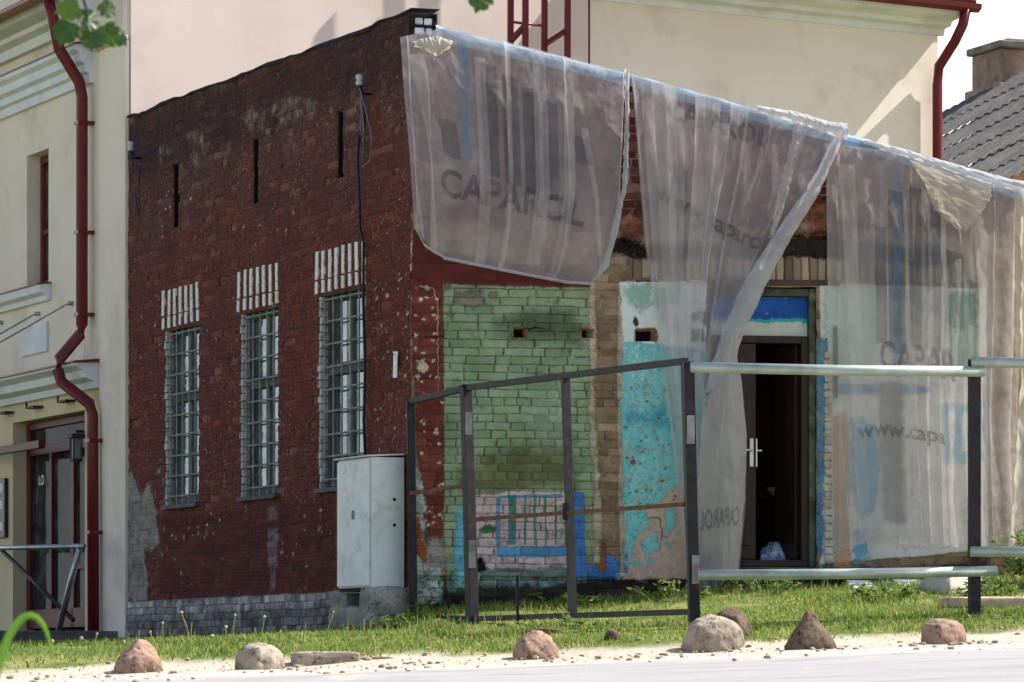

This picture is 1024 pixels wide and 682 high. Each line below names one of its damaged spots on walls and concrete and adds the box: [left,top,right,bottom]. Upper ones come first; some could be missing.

spalling [608,200,796,261]
spalling [783,196,948,267]
damp [475,386,574,491]
peeling [374,230,707,608]
peeling [128,459,221,603]